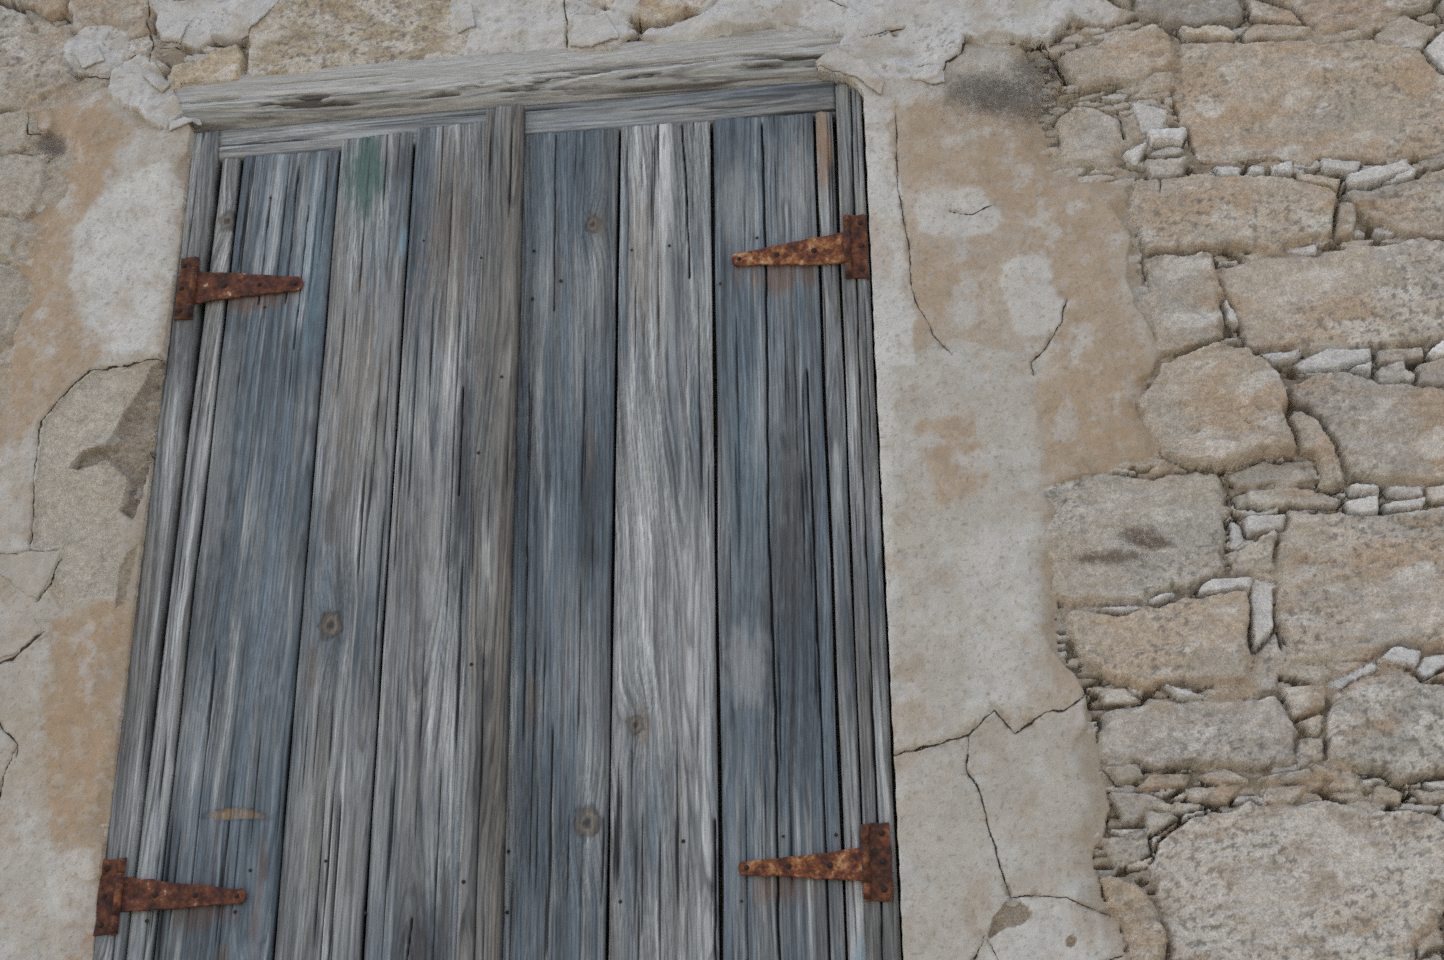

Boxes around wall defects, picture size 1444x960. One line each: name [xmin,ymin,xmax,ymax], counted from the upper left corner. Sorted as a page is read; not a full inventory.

crack [895,115,949,351]
crack [1031,301,1067,371]
crack [0,359,163,664]
flaking render [0,358,166,611]
flaking render [0,618,42,658]
crack [0,723,18,797]
crack [894,694,1111,916]